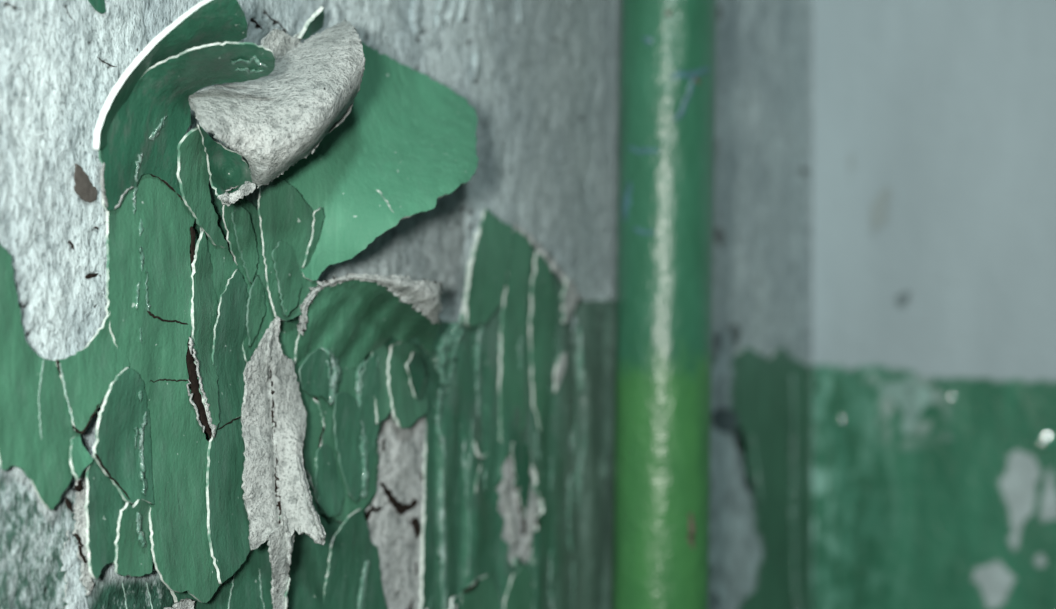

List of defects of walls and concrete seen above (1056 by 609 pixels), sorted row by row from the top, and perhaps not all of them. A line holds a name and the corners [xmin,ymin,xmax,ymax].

crack [150,174,183,200]
crack [189,226,197,264]
peeling [0,0,587,609]
crack [147,311,241,439]
crack [38,359,130,499]
crack [313,397,325,467]
spalling [708,326,766,609]
spalling [998,448,1056,554]
crack [122,582,153,609]
crack [228,568,265,609]
spalling [971,559,1017,609]